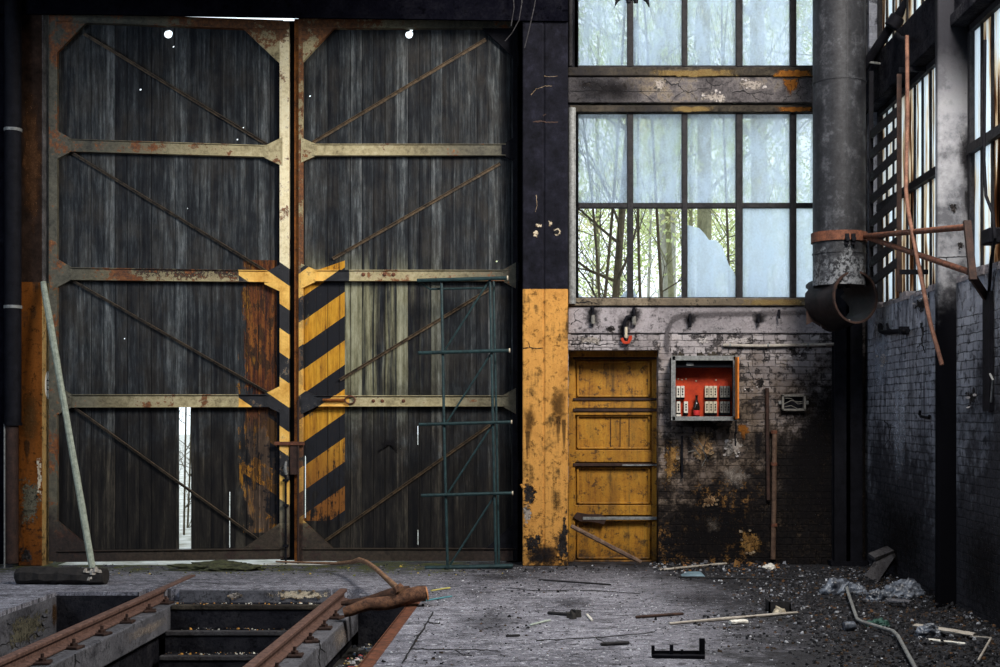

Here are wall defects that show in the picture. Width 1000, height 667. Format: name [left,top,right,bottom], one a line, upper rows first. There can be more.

spalling [700,90,726,103]
crack [626,78,807,103]
spalling [739,79,767,90]
peeling [520,478,543,554]
peeling [556,511,568,564]